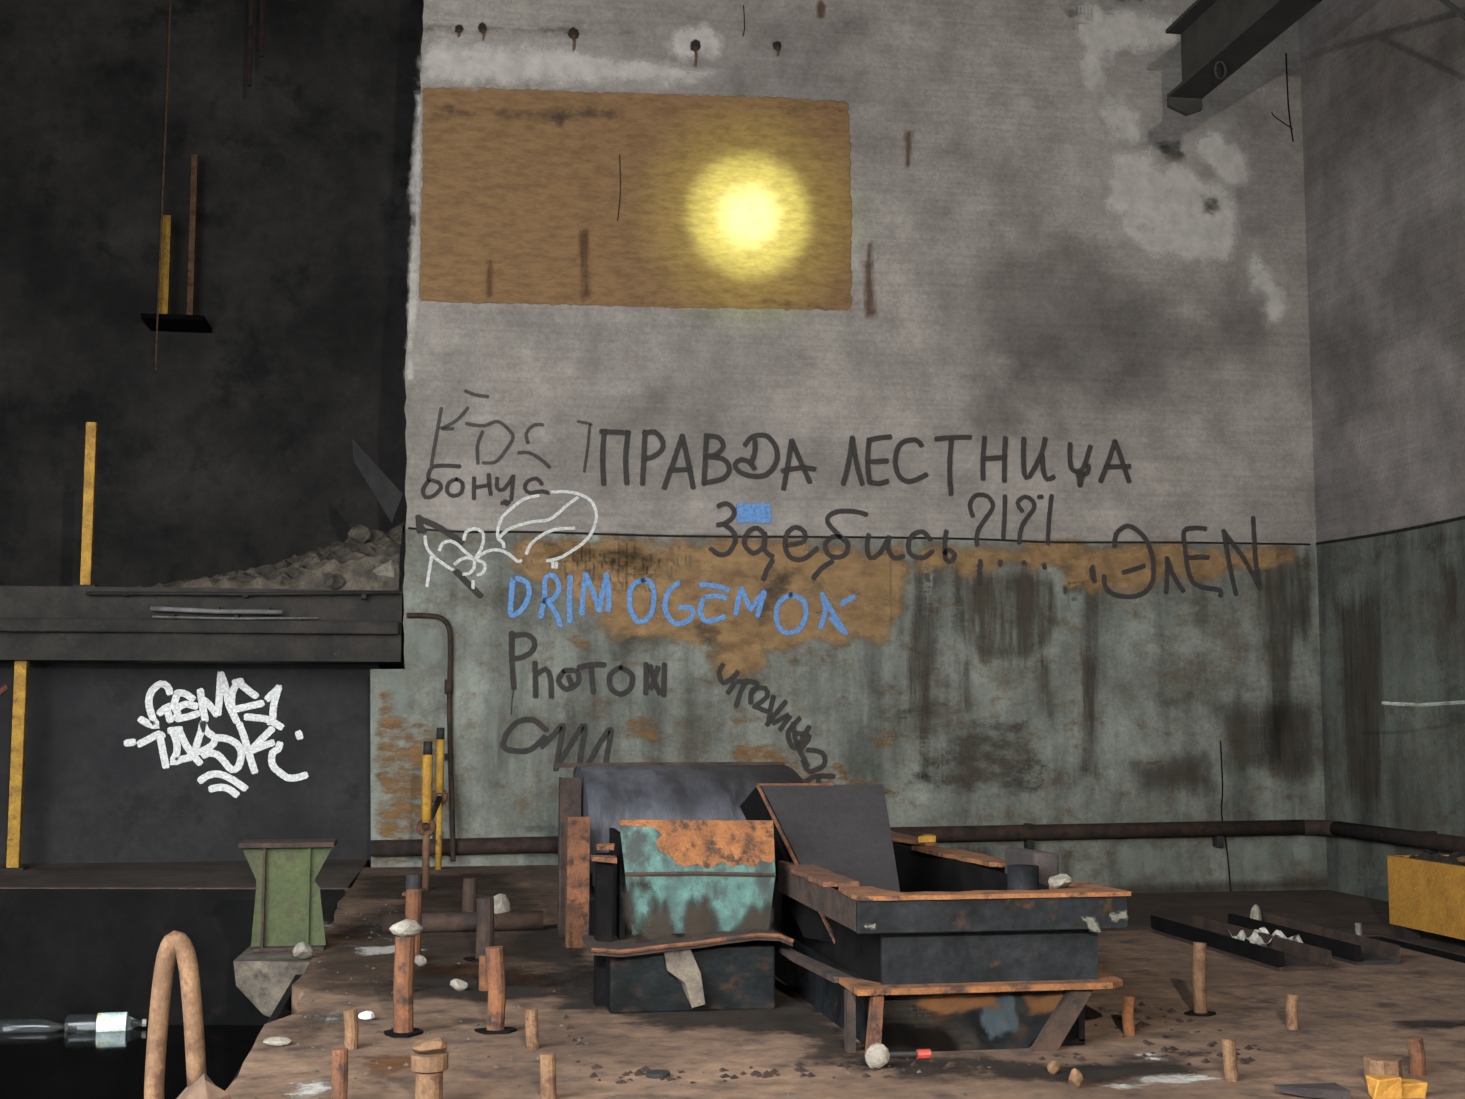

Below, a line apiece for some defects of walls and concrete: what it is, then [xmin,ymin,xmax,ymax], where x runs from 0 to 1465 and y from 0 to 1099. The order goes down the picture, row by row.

corrosion [377,693,436,840]
corrosion [734,745,869,865]
leakage [909,565,1037,789]
leakage [954,572,1096,666]
leakage [1338,600,1380,799]